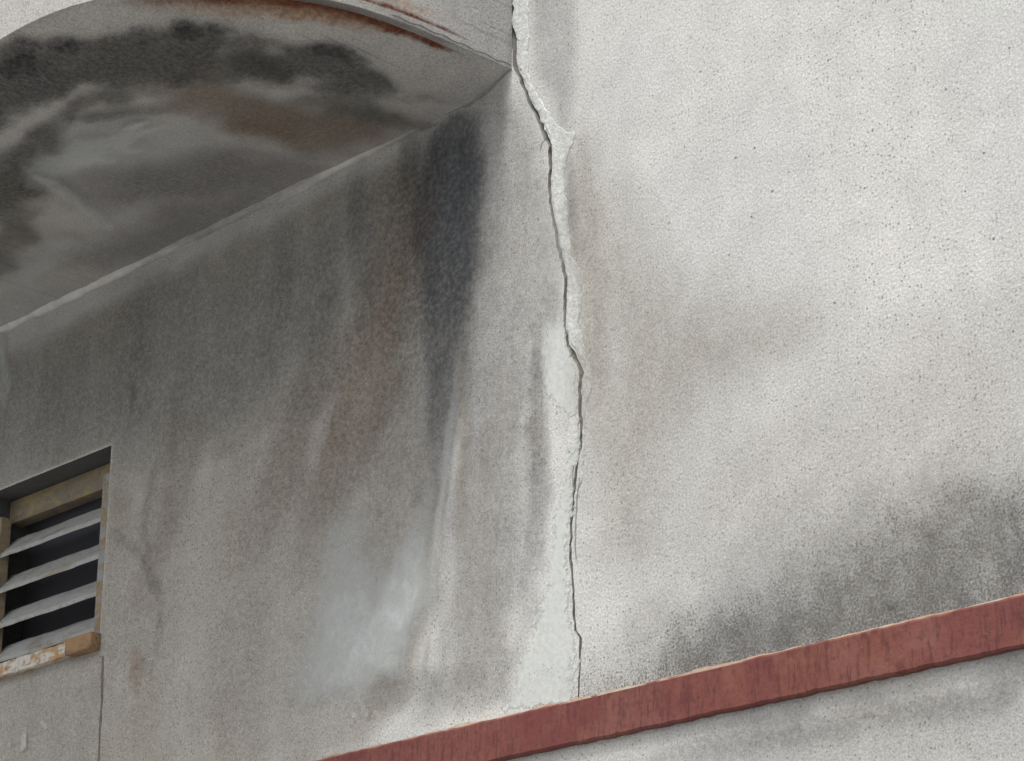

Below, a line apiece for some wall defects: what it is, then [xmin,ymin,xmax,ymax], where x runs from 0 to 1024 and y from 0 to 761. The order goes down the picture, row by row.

damp [0,21,396,247]
corrosion [157,0,463,52]
crack [393,0,584,697]
damp [540,317,578,417]
damp [497,430,1024,713]